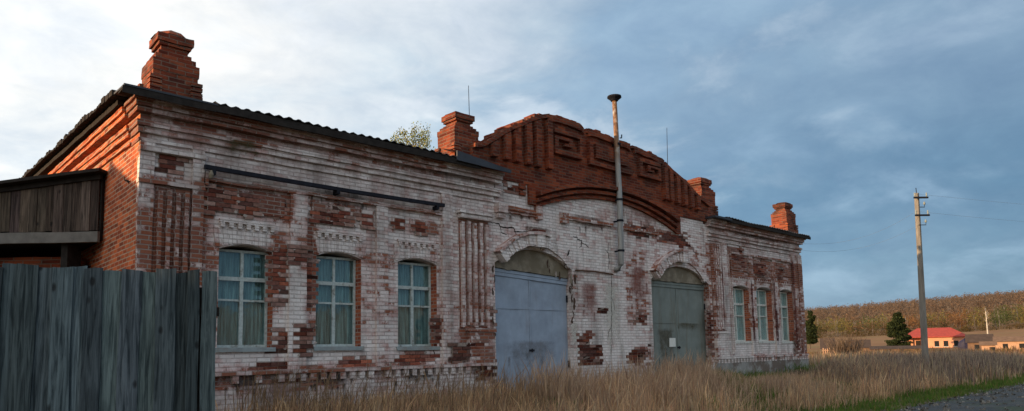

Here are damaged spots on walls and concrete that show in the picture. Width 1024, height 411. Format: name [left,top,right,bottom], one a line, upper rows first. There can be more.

peeling [154,154,189,176]
peeling [204,183,290,220]
crack [491,185,541,250]
peeling [264,244,321,308]
peeling [727,246,785,279]
peeling [389,265,498,384]
peeling [543,260,604,366]
peeling [628,309,647,326]
peeling [626,344,652,366]